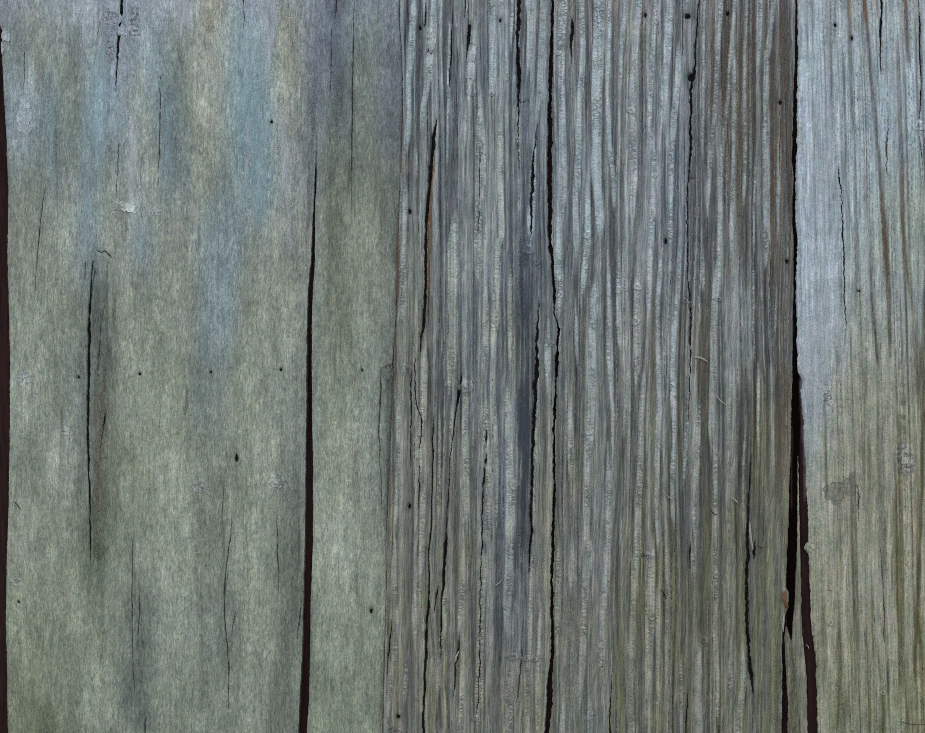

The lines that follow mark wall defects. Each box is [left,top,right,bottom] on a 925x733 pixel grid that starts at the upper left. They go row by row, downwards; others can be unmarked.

crack [86,251,113,558]
crack [378,119,487,733]
crack [682,0,700,420]